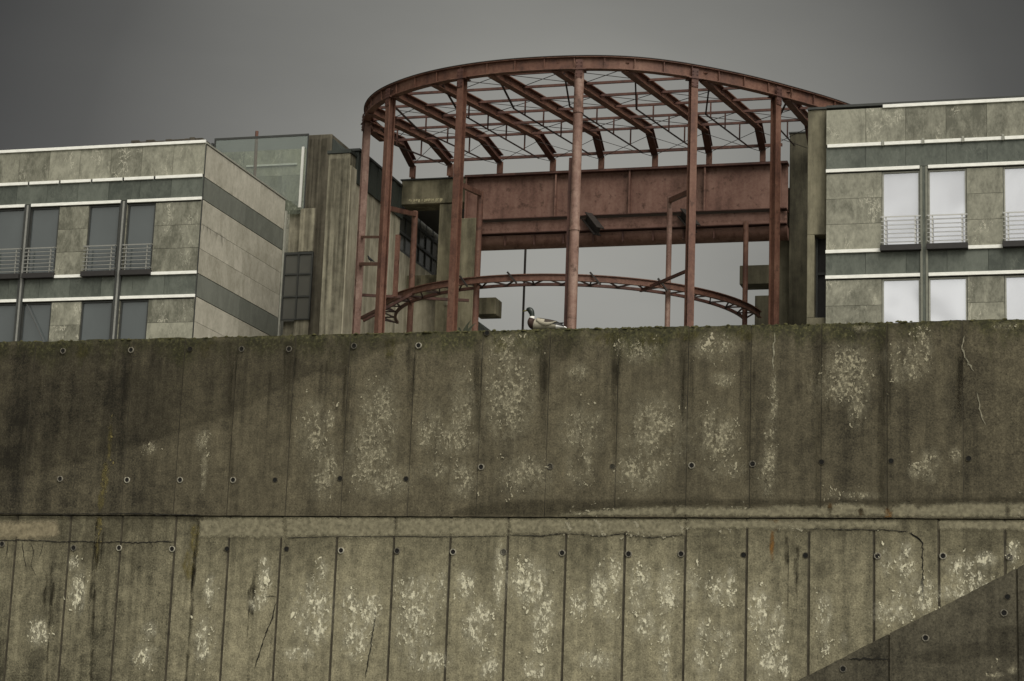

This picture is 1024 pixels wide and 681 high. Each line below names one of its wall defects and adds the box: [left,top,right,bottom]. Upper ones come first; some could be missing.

crack [961,336,986,425]
crack [802,528,924,604]
crack [255,596,276,666]
crack [365,603,377,678]